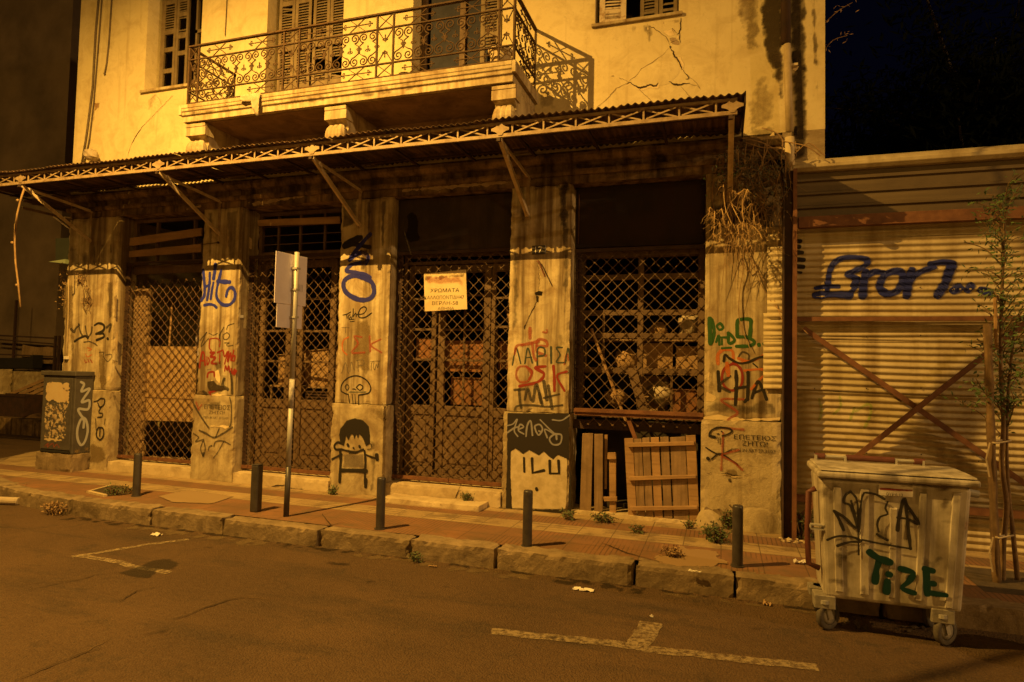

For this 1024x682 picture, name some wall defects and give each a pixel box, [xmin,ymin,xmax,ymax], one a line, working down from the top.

crack [597,20,701,107]
water stain [740,0,817,159]